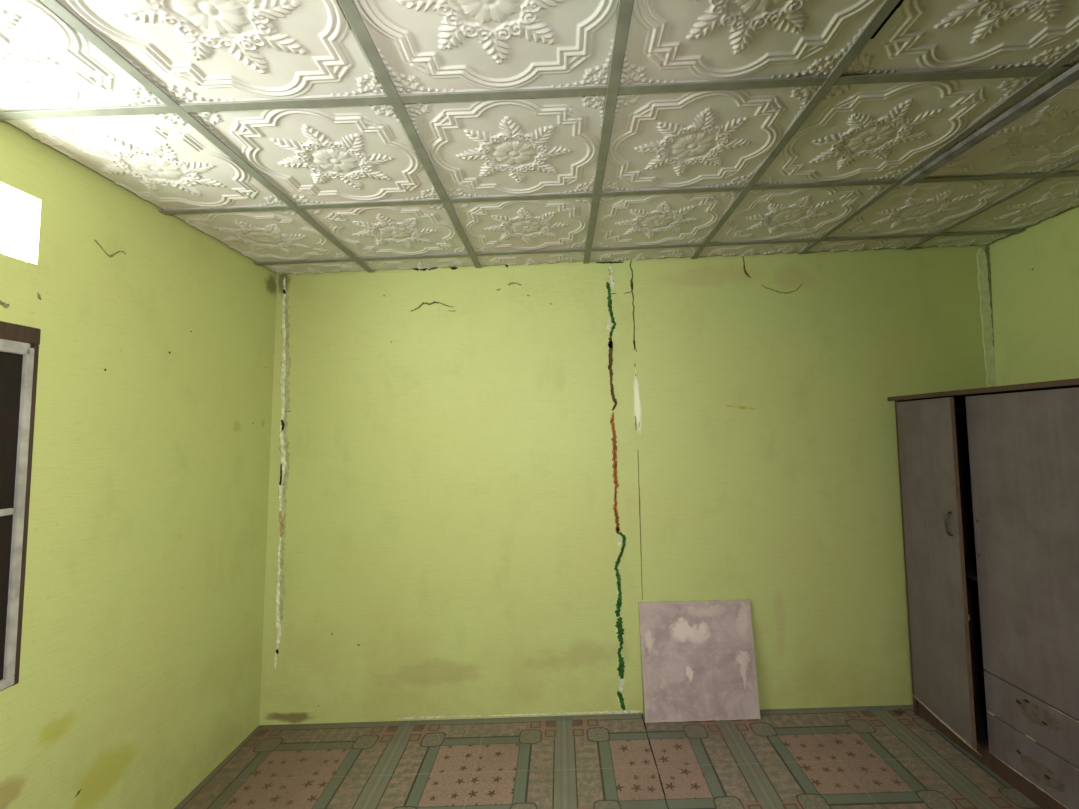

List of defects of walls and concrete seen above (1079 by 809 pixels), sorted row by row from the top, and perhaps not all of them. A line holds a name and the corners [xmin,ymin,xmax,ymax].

crack [411,301,455,312]
crack [606,260,669,809]
damp [25,701,87,758]
damp [260,710,327,725]
damp [63,726,154,809]